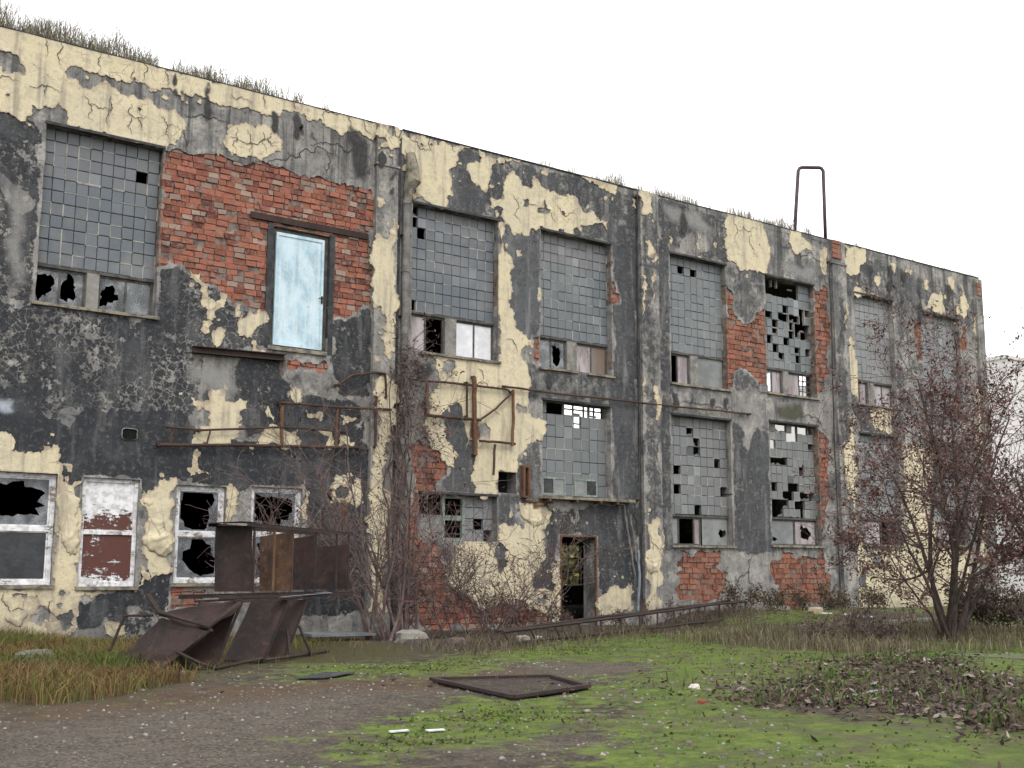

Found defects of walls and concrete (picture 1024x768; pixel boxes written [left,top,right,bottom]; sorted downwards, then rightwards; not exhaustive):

crack [0,39,63,95]
flaking render [0,27,770,638]
peeling [733,422,831,610]
peeling [789,230,987,608]